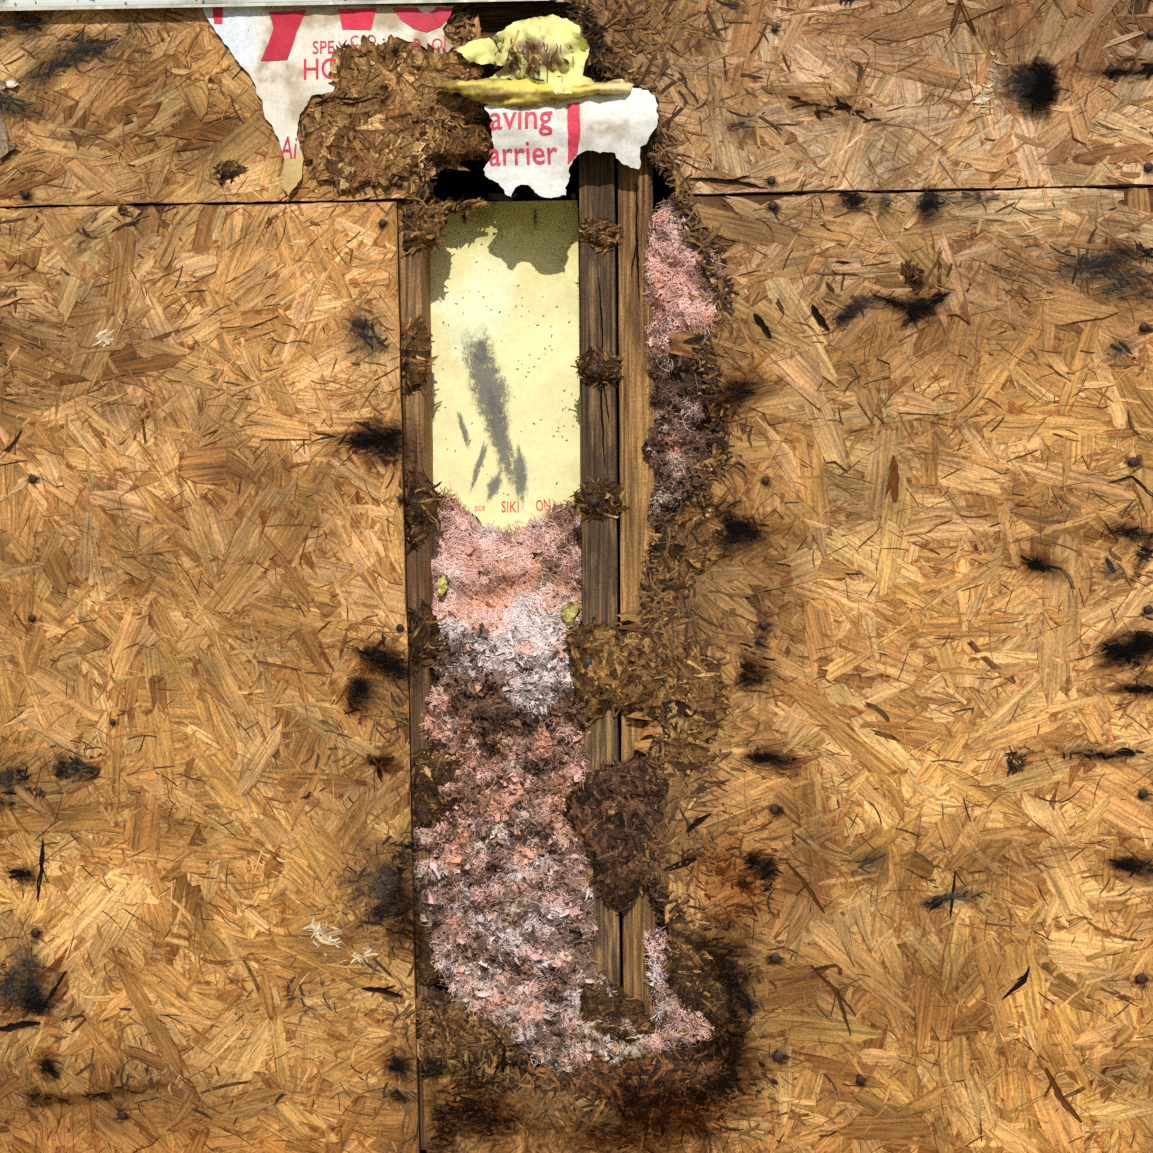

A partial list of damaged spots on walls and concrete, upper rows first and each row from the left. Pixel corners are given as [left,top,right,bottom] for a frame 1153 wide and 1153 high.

spalling [0,79,19,90]
spalling [0,114,18,159]
damp [1059,240,1153,300]
damp [92,319,123,348]
damp [832,291,951,329]
peeling [458,333,527,500]
peeling [736,636,776,687]
damp [1101,630,1153,697]
damp [0,762,31,812]
damp [55,755,102,782]
peeling [734,849,784,894]
peeling [684,920,778,1124]